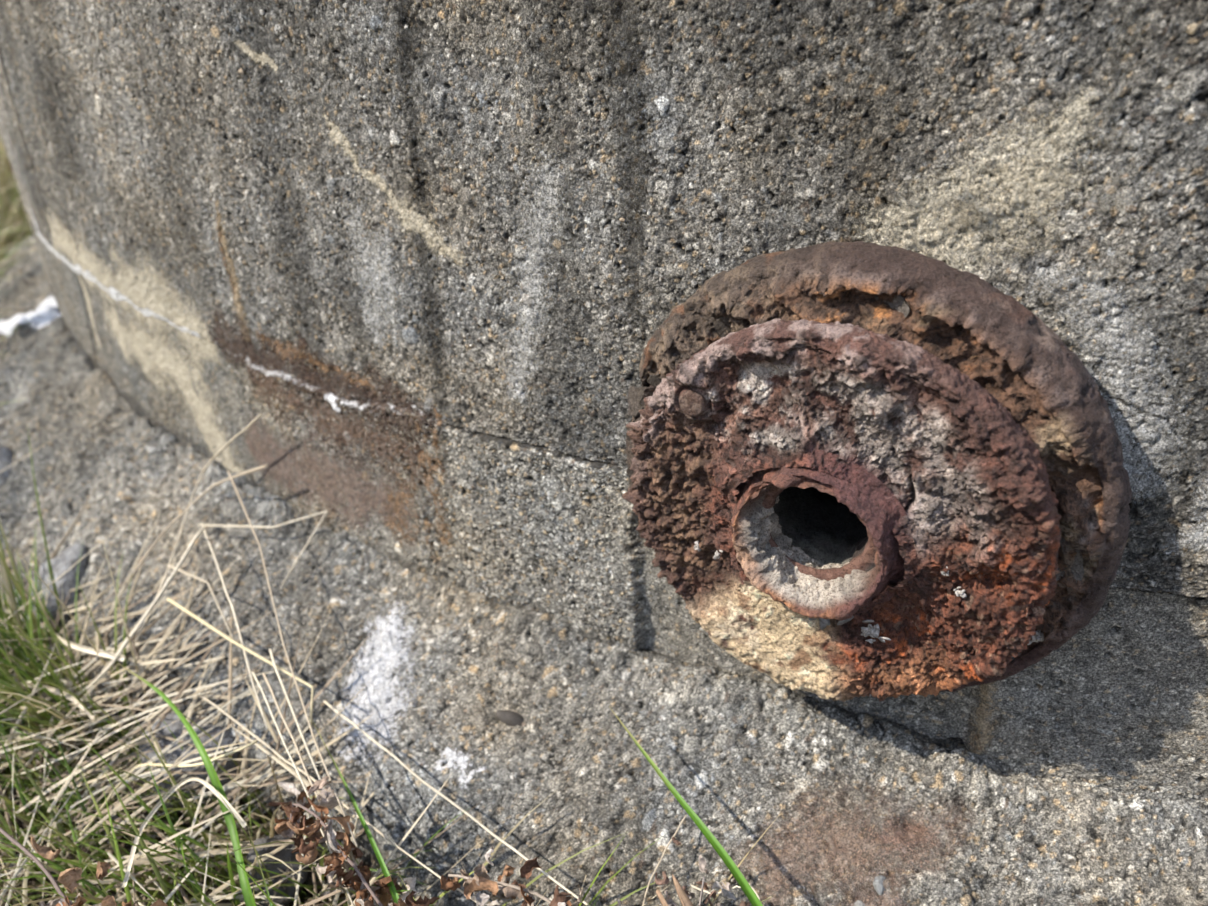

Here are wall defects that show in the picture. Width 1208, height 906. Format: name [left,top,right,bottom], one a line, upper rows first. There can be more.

corrosion [209,201,451,567]
crack [1139,590,1208,608]